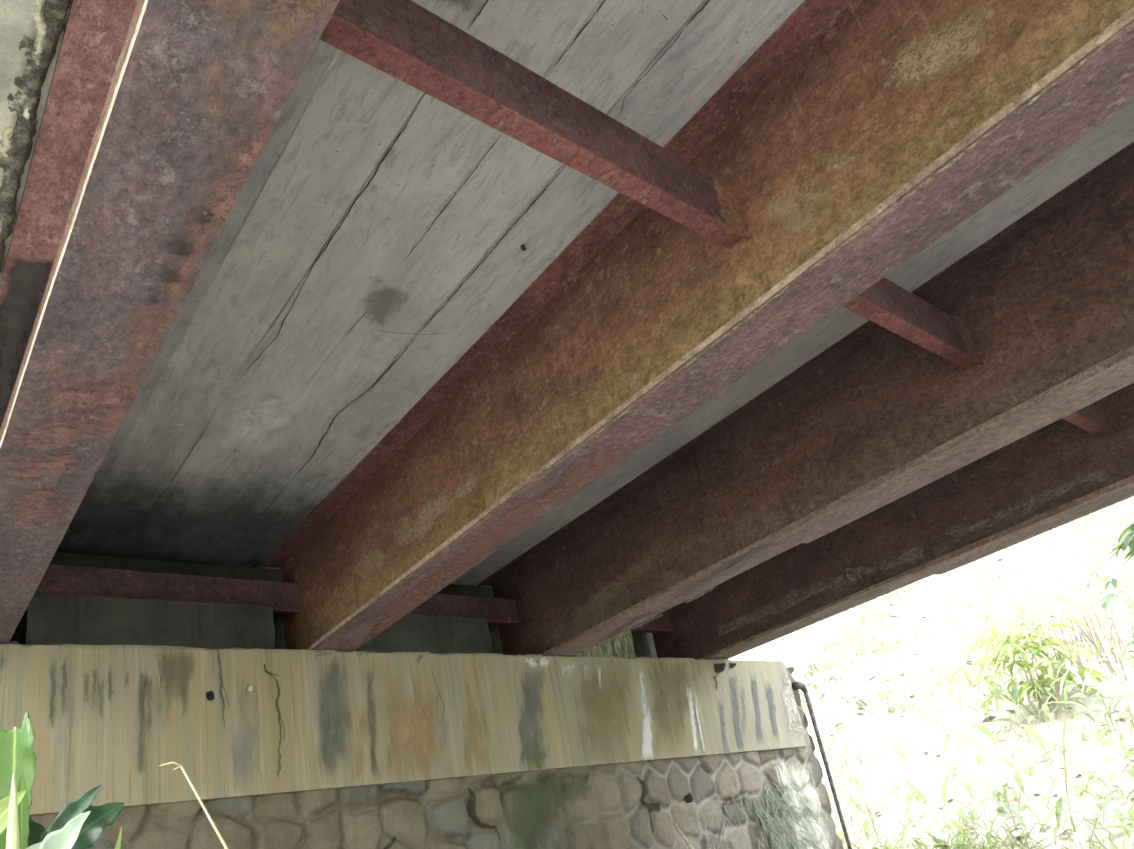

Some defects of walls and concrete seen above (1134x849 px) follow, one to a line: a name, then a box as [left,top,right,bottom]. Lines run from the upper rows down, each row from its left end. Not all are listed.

spalling [0,0,71,273]
water stain [56,476,319,569]
crack [264,663,285,778]
water stain [319,665,347,765]
water stain [368,673,376,771]
water stain [522,673,546,768]
water stain [578,665,628,761]
water stain [639,670,705,759]